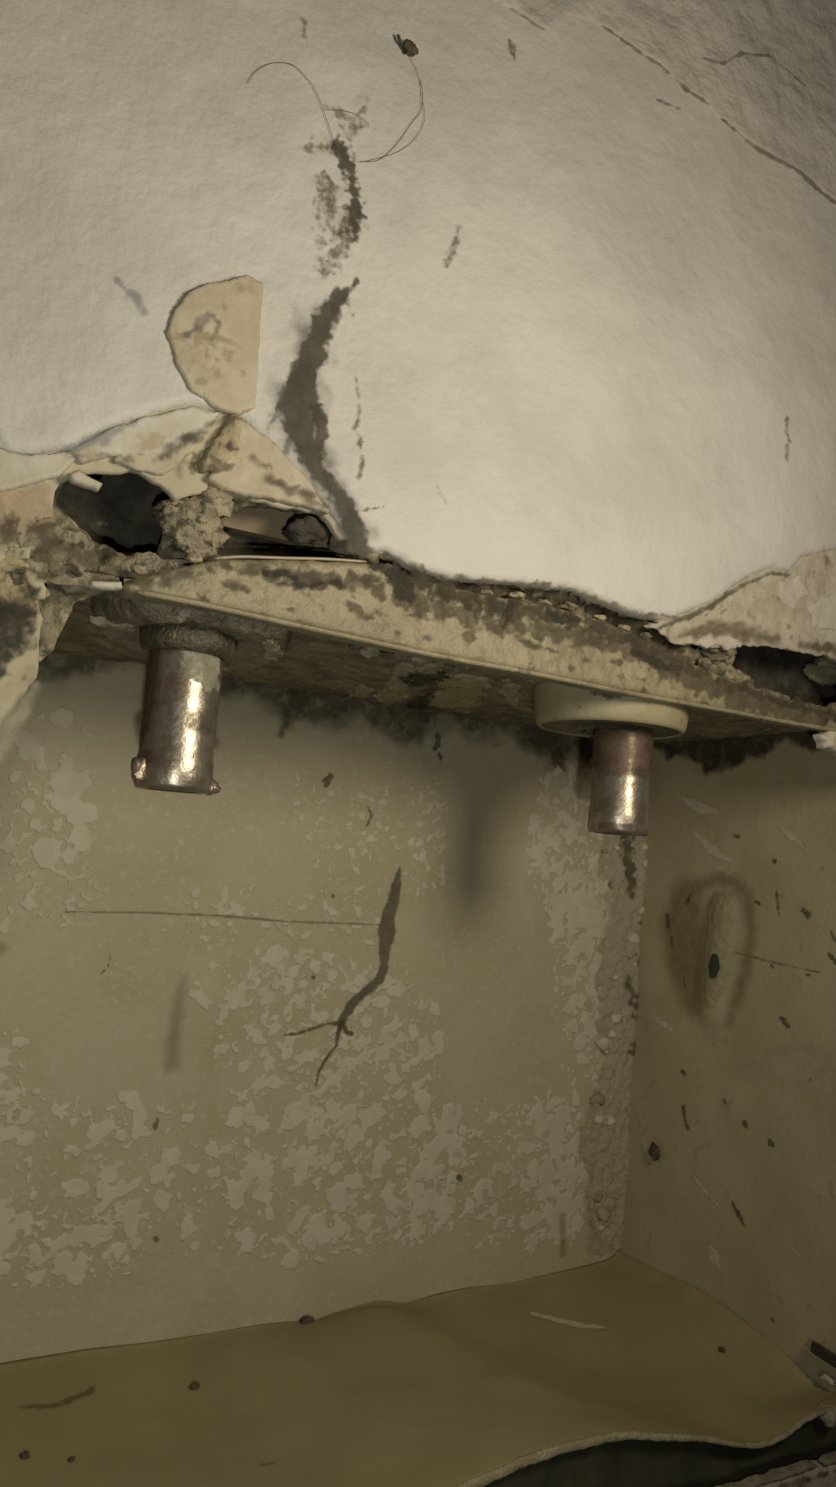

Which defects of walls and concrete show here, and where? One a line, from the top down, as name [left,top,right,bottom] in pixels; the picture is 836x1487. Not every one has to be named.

peeling [0,275,836,713]
damp [0,564,112,678]
damp [89,615,137,631]
damp [220,671,593,768]
rust [592,729,654,776]
damp [652,730,821,774]
peeling [813,731,836,758]
peeling [0,683,100,937]
crack [67,868,401,1085]
peeling [0,758,620,1289]
damp [581,834,648,1255]